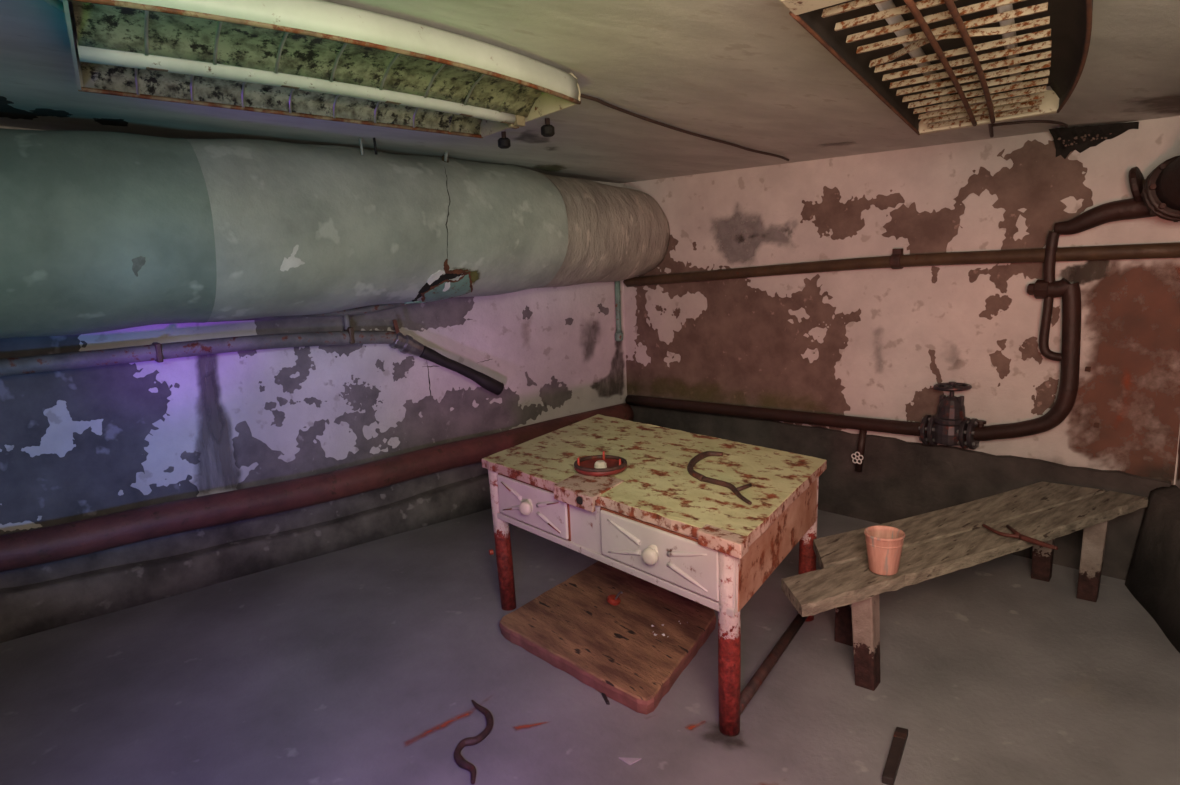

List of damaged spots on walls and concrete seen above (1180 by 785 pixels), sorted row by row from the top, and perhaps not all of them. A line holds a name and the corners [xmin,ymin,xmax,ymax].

peeling [800,121,1139,320]
peeling [0,334,88,359]
peeling [0,363,199,535]
water stain [198,354,240,492]
peeling [626,235,861,430]
peeling [905,349,944,423]
peeling [989,336,1043,387]
peeling [1031,377,1059,415]